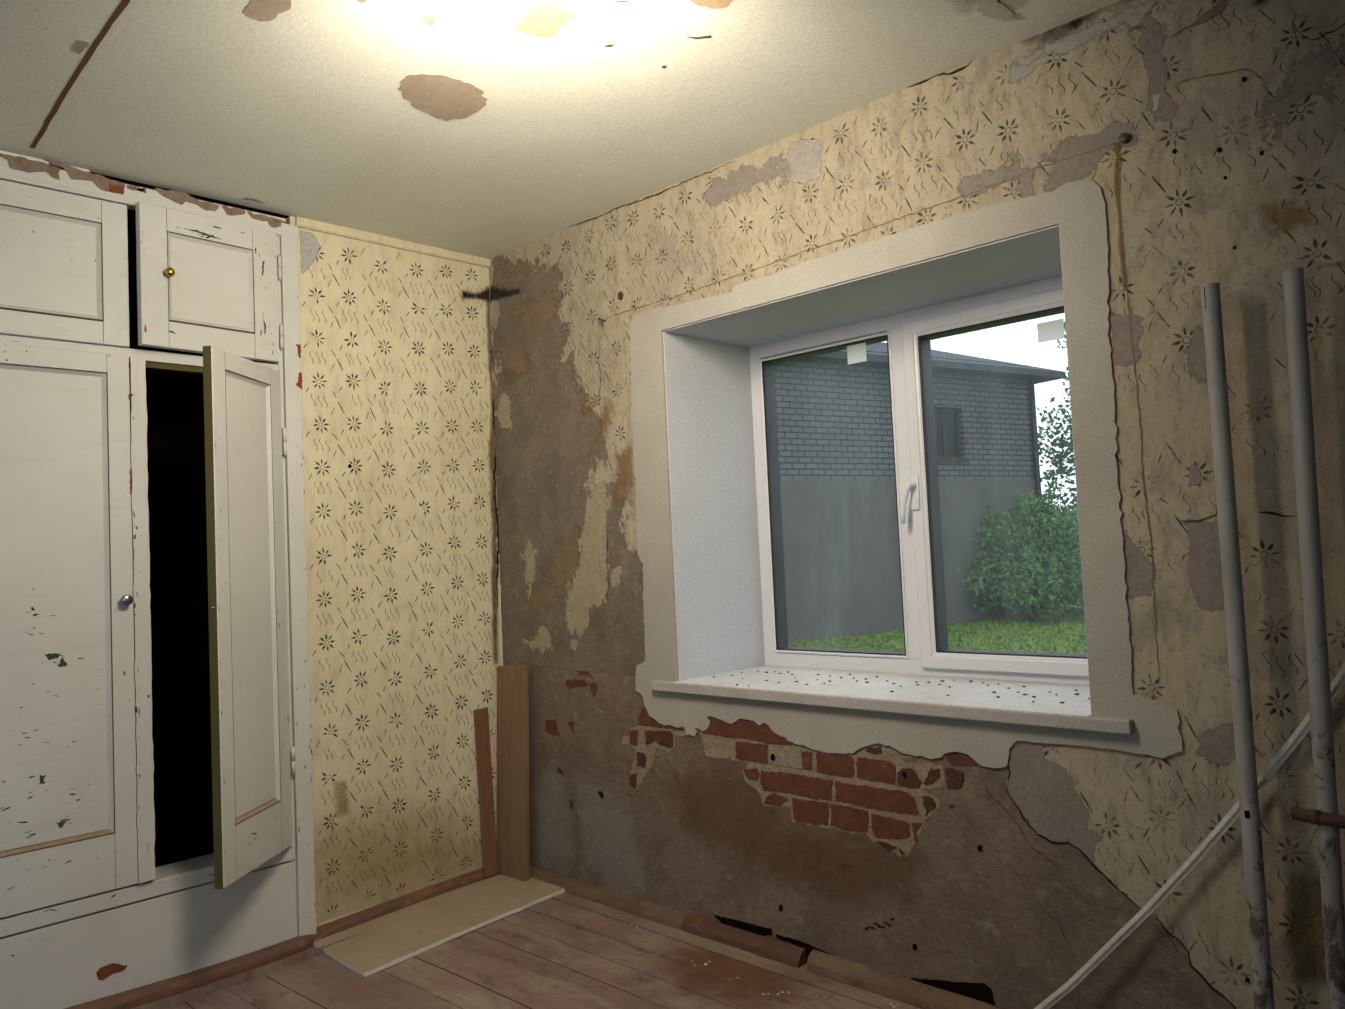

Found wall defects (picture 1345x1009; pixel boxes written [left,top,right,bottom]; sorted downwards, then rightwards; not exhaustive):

peeling [243,0,291,21]
peeling [516,2,577,37]
peeling [690,0,733,9]
peeling [1013,0,1228,121]
peeling [398,73,488,122]
peeling [702,139,822,206]
peeling [957,121,1138,198]
flaking render [489,255,1236,1009]